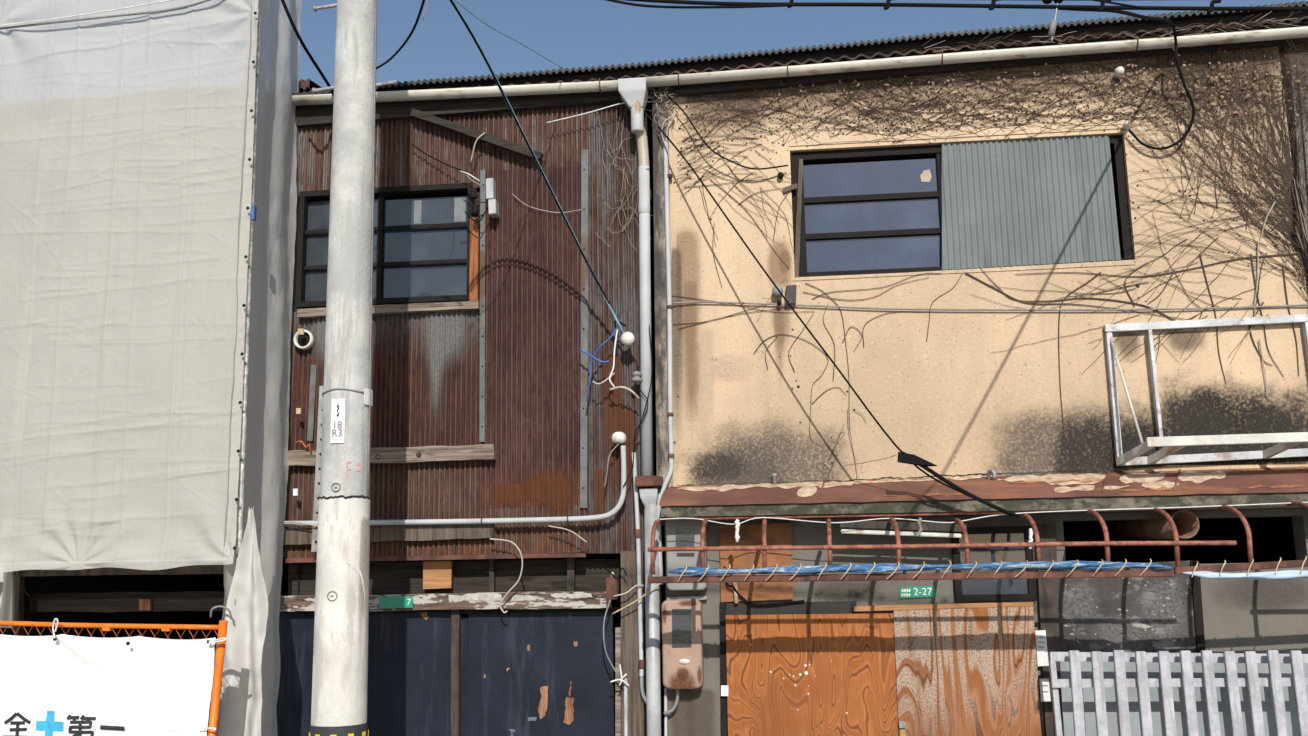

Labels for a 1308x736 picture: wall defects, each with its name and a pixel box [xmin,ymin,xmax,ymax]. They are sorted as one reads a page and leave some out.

water stain [315,317,326,354]
water stain [426,311,464,399]
water stain [1119,333,1136,355]
water stain [1171,331,1200,348]
water stain [1000,386,1308,476]
water stain [694,428,839,486]
peeling [678,476,981,497]
peeling [997,471,1227,493]
peeling [527,686,548,721]
peeling [564,682,574,725]